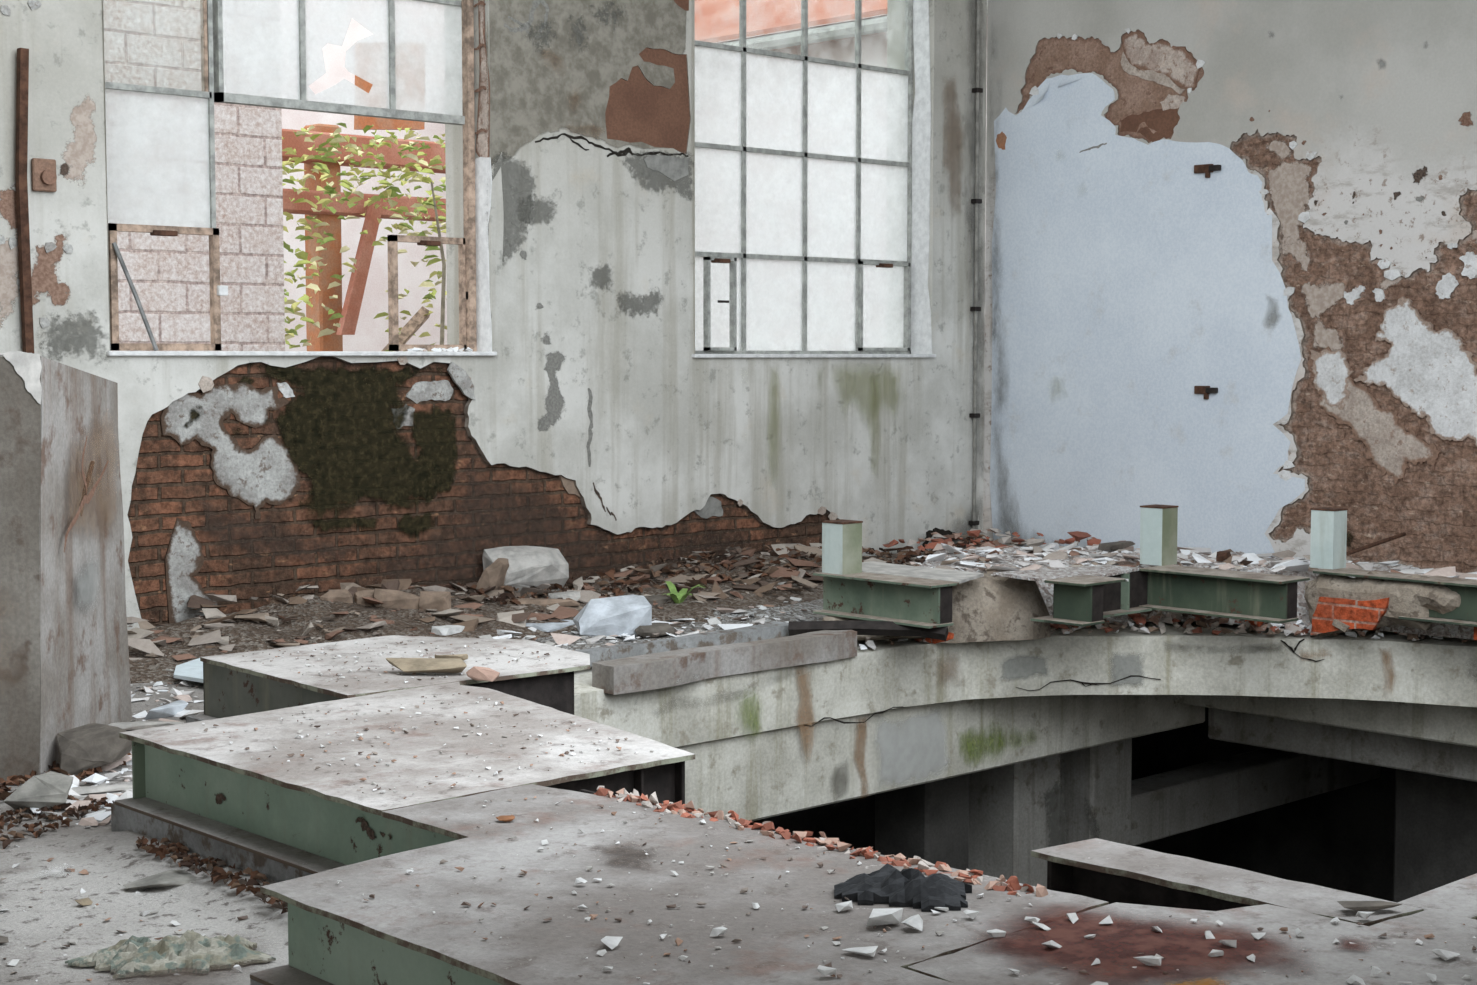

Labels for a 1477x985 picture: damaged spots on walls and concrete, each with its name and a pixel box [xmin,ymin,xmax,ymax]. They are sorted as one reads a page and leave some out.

peeling [605,47,691,154]
crack [535,133,689,181]
peeling [0,182,18,250]
peeling [16,234,73,328]
peeling [990,28,1477,573]
peeling [538,333,565,431]
flaking render [127,356,839,626]
crack [1016,675,1161,691]